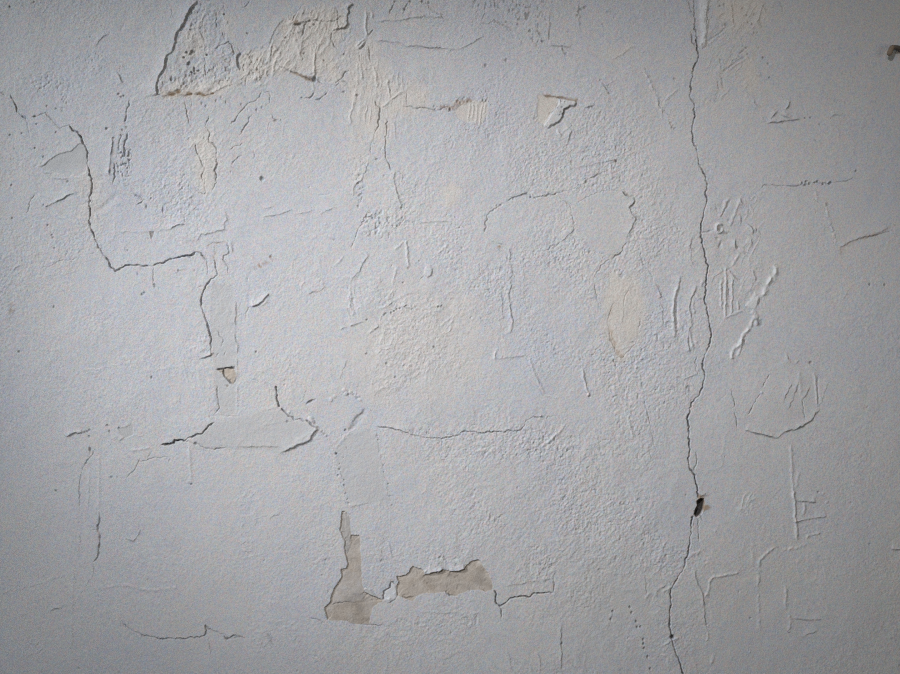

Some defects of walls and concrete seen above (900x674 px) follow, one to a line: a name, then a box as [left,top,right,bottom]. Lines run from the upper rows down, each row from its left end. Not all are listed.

peeling [153,0,572,127]
peeling [537,92,580,143]
crack [0,91,234,360]
crack [606,0,714,674]
crack [125,384,240,486]
crack [252,378,338,455]
crack [374,414,568,449]
peeling [307,510,494,628]
crack [120,621,275,658]